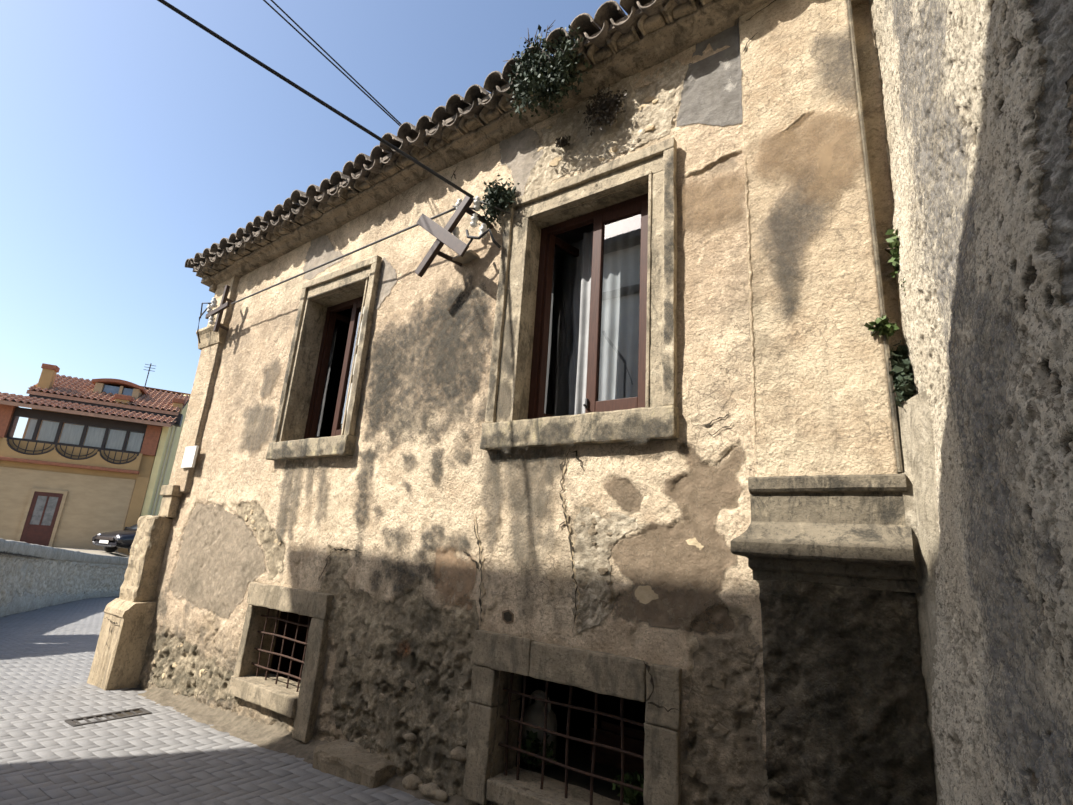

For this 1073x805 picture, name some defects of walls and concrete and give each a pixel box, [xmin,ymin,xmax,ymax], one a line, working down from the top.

water stain [664,152,744,227]
water stain [756,113,860,312]
water stain [663,297,673,343]
water stain [243,311,328,539]
water stain [370,525,469,592]
water stain [345,265,515,564]
water stain [456,420,575,567]
crack [558,449,585,634]
spalling [571,506,651,633]
peeling [635,585,659,604]
peeling [685,537,704,550]
spalling [318,546,479,805]